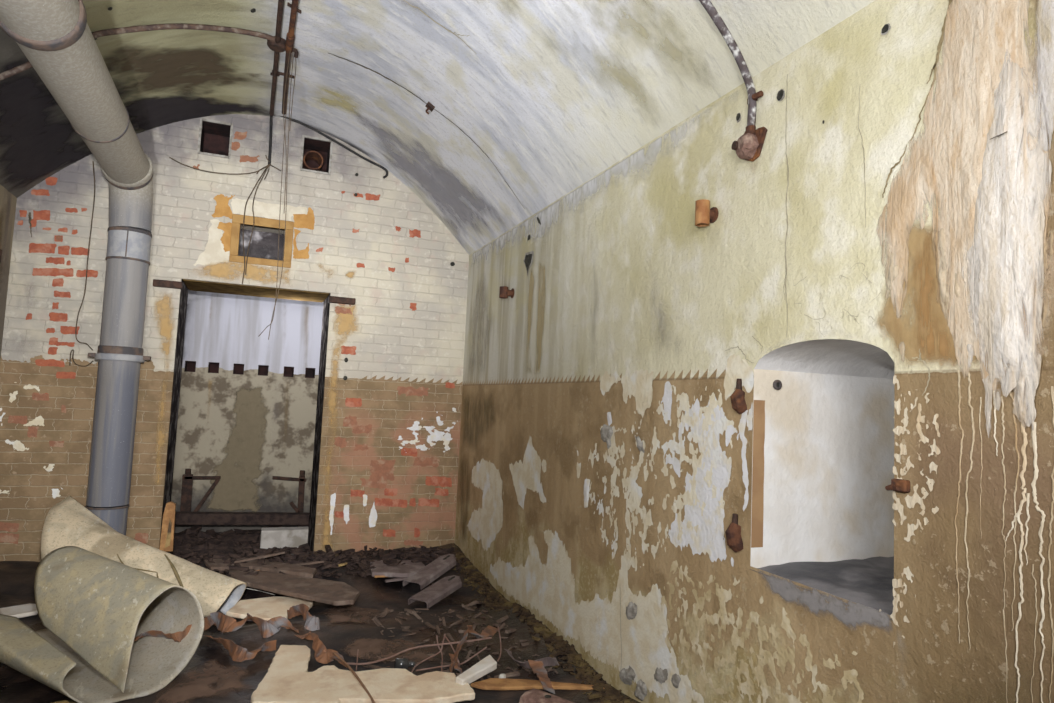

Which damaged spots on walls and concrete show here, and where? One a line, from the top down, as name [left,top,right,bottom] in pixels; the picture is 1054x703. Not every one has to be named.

peeling [31,177,58,196]
peeling [212,194,235,252]
peeling [293,207,323,259]
peeling [341,191,380,201]
peeling [395,226,421,238]
peeling [17,210,98,379]
water stain [876,0,1054,703]
peeling [0,382,49,451]
peeling [329,398,458,547]
peeling [892,375,940,542]
peeling [467,354,916,703]